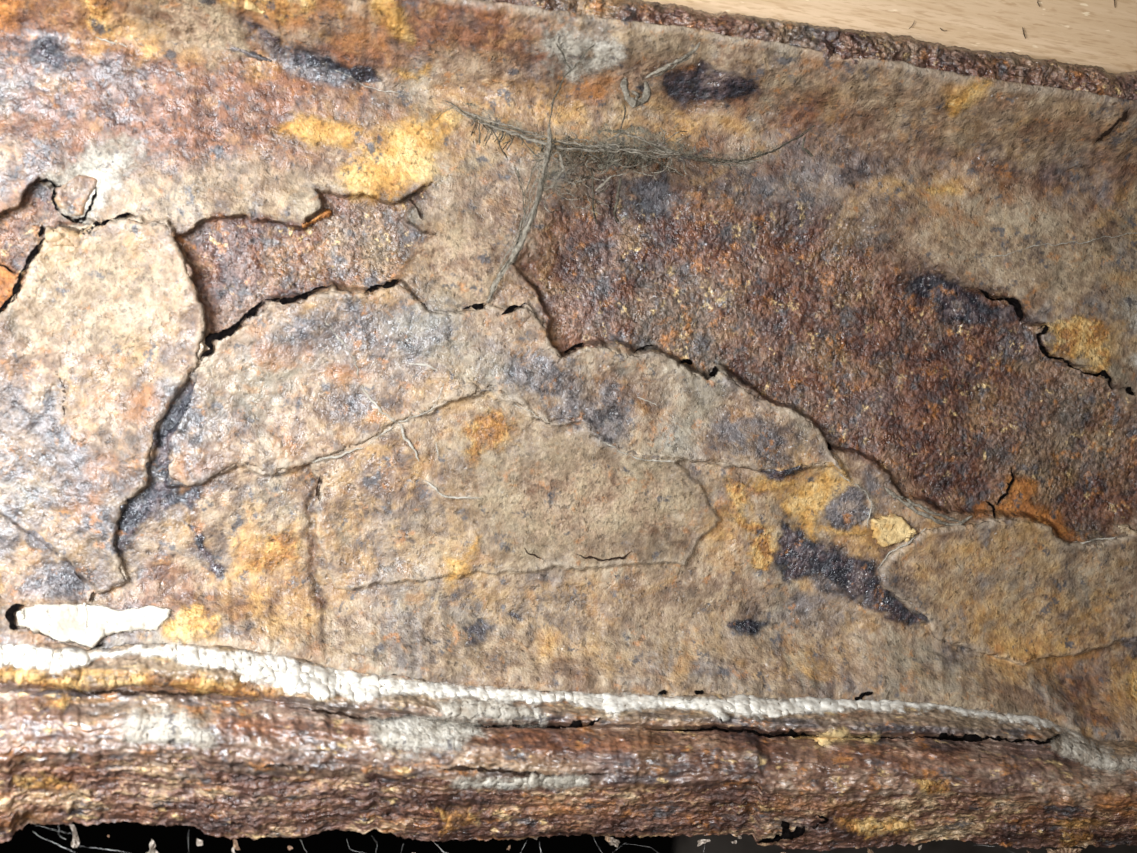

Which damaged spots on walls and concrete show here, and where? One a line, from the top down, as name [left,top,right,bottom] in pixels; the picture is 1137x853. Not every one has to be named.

corrosion [338,110,462,200]
spalling [0,175,97,284]
crack [0,178,130,312]
crack [200,285,331,360]
spalling [173,181,433,340]
crack [363,279,399,294]
crack [463,302,526,315]
crack [980,289,1134,395]
peeling [16,603,172,649]
corrosion [0,665,277,709]
corrosion [70,824,80,848]
corrosion [836,816,912,853]